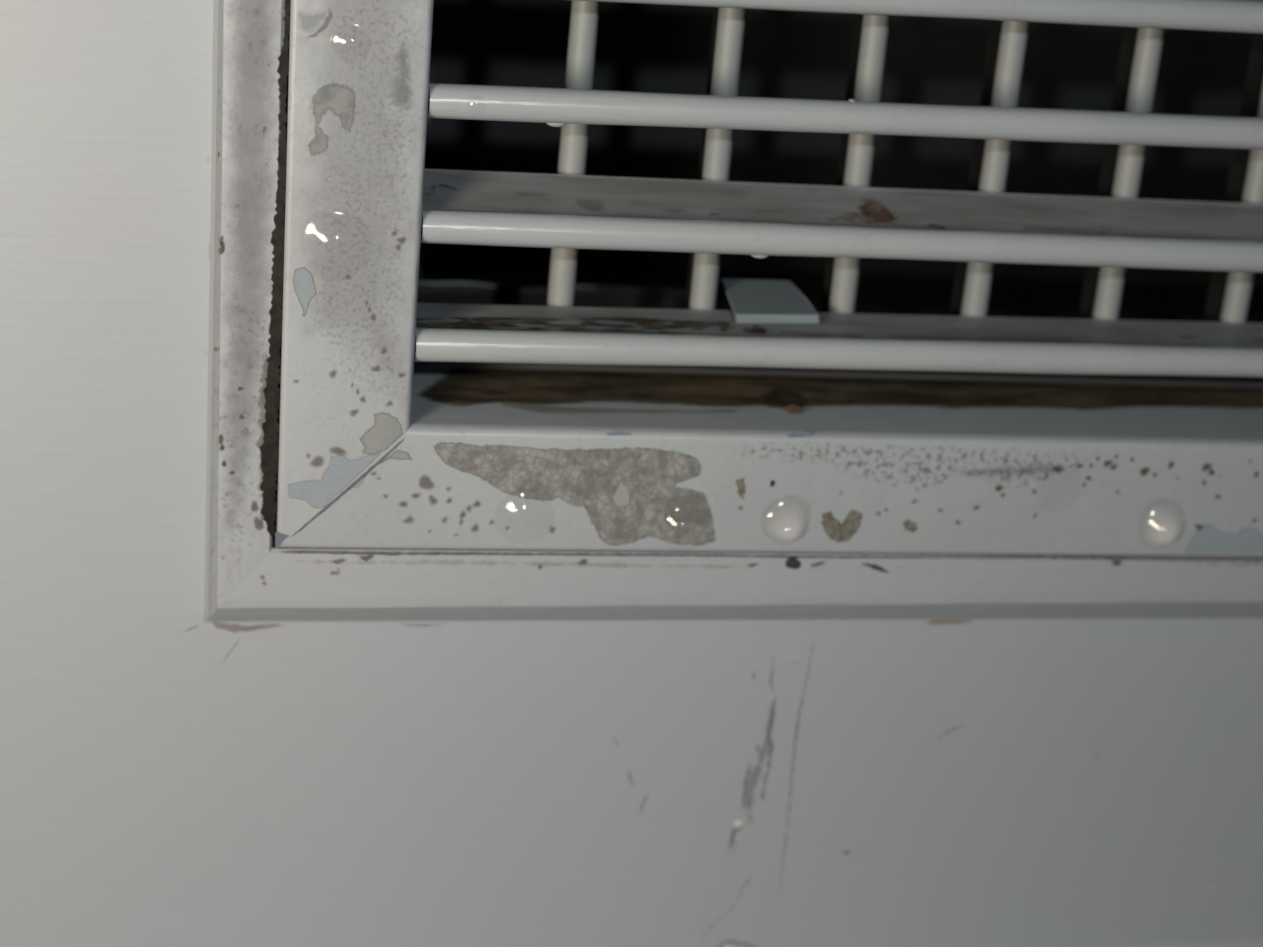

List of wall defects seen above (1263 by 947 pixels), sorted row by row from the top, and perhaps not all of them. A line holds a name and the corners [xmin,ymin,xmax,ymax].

peeling [309,84,355,155]
corrosion [832,199,896,223]
peeling [293,268,316,316]
damp [307,448,344,466]
peeling [288,412,412,509]
peeling [434,432,715,546]
damp [1078,455,1156,486]
peeling [821,510,862,542]
crack [729,646,813,879]